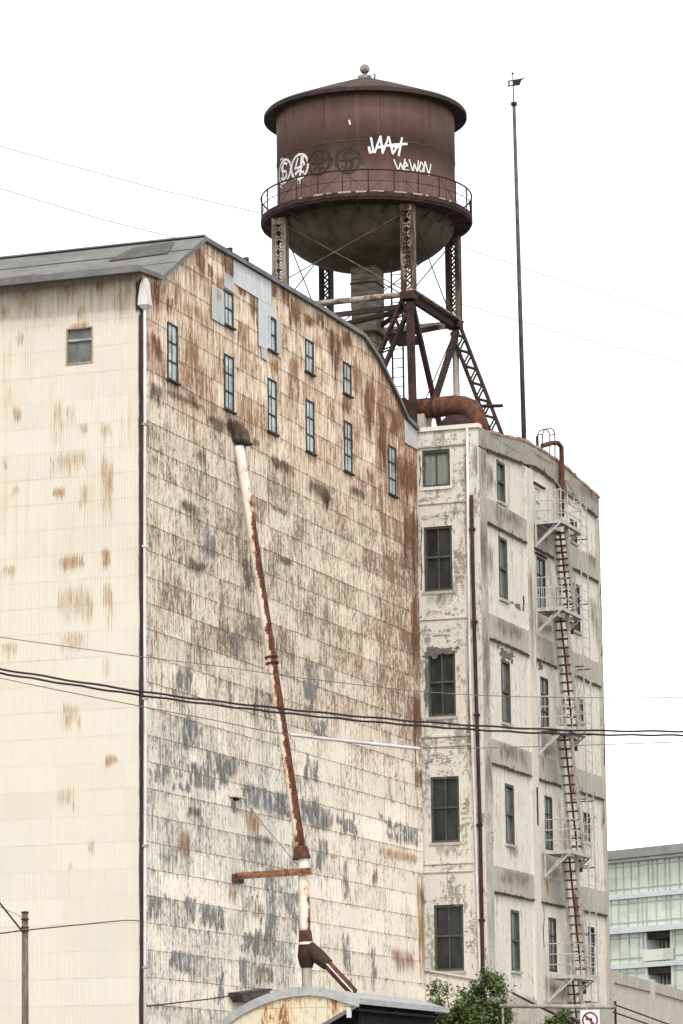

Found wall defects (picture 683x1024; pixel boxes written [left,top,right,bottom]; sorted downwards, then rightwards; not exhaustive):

rust [196,249,257,347]
rust [271,284,352,379]
damp [151,382,243,438]
damp [273,457,294,475]
damp [309,480,331,511]
rust [343,361,418,576]
peeling [418,433,466,526]
flaking render [419,607,465,721]
peeling [421,737,463,778]